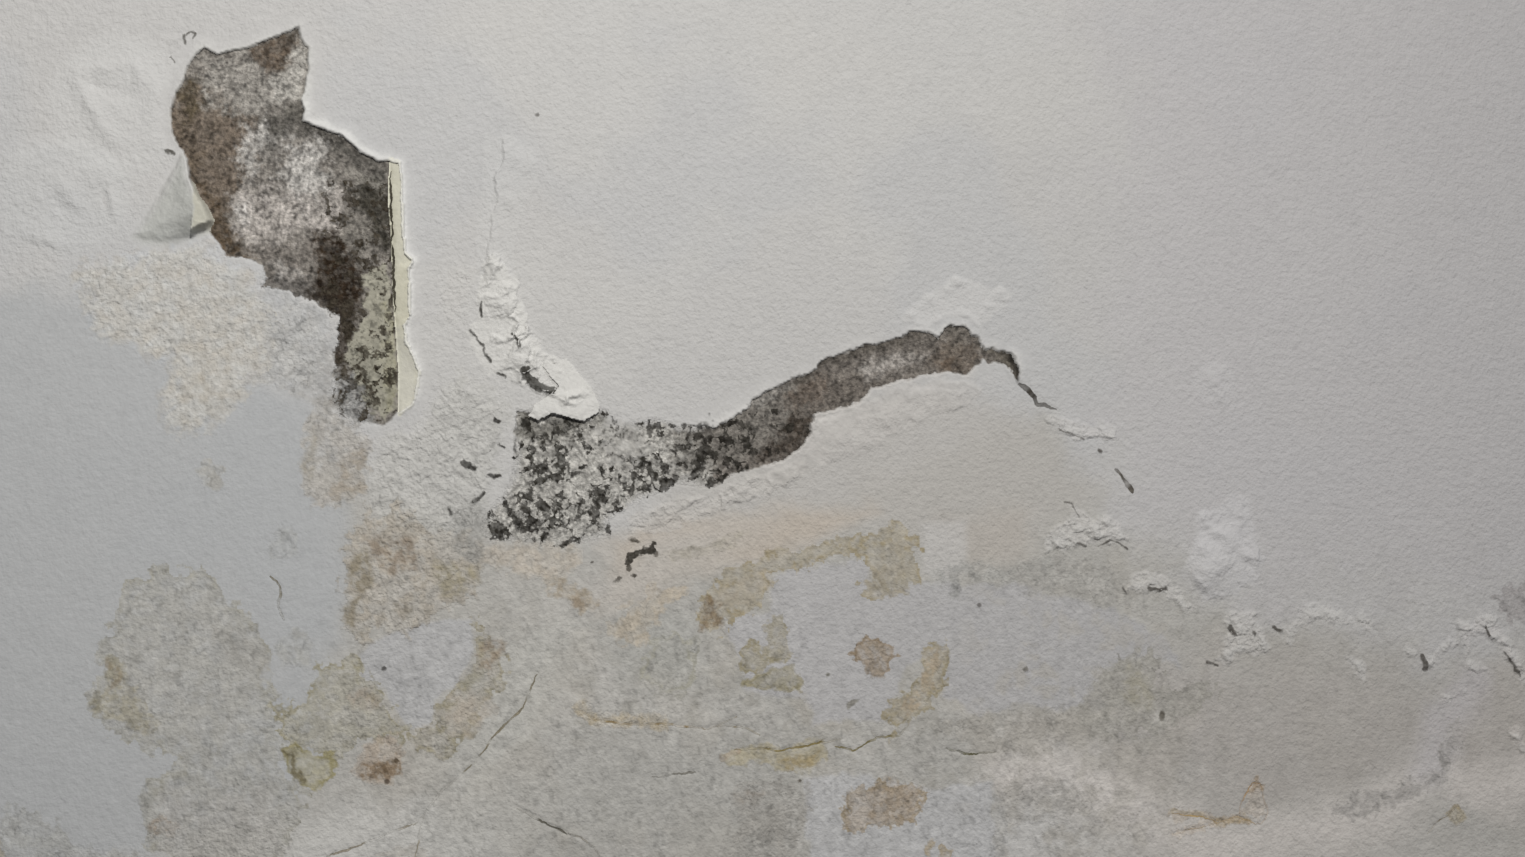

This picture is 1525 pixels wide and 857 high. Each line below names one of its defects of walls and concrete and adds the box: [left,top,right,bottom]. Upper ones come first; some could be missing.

peeling [124,14,433,429]
peeling [467,249,1035,548]
damp [0,269,1134,857]
crack [329,675,536,856]
damp [881,637,1224,857]